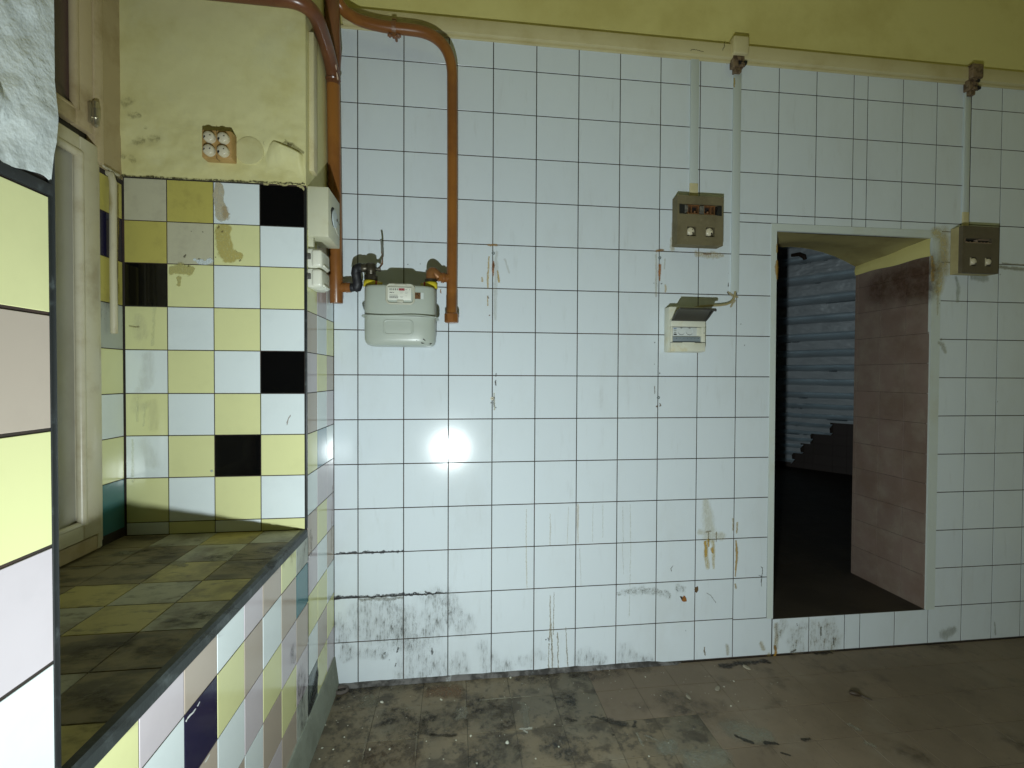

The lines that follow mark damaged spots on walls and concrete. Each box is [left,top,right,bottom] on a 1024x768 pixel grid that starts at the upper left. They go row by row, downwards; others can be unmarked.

peeling [169,183,243,286]
water stain [334,591,452,666]